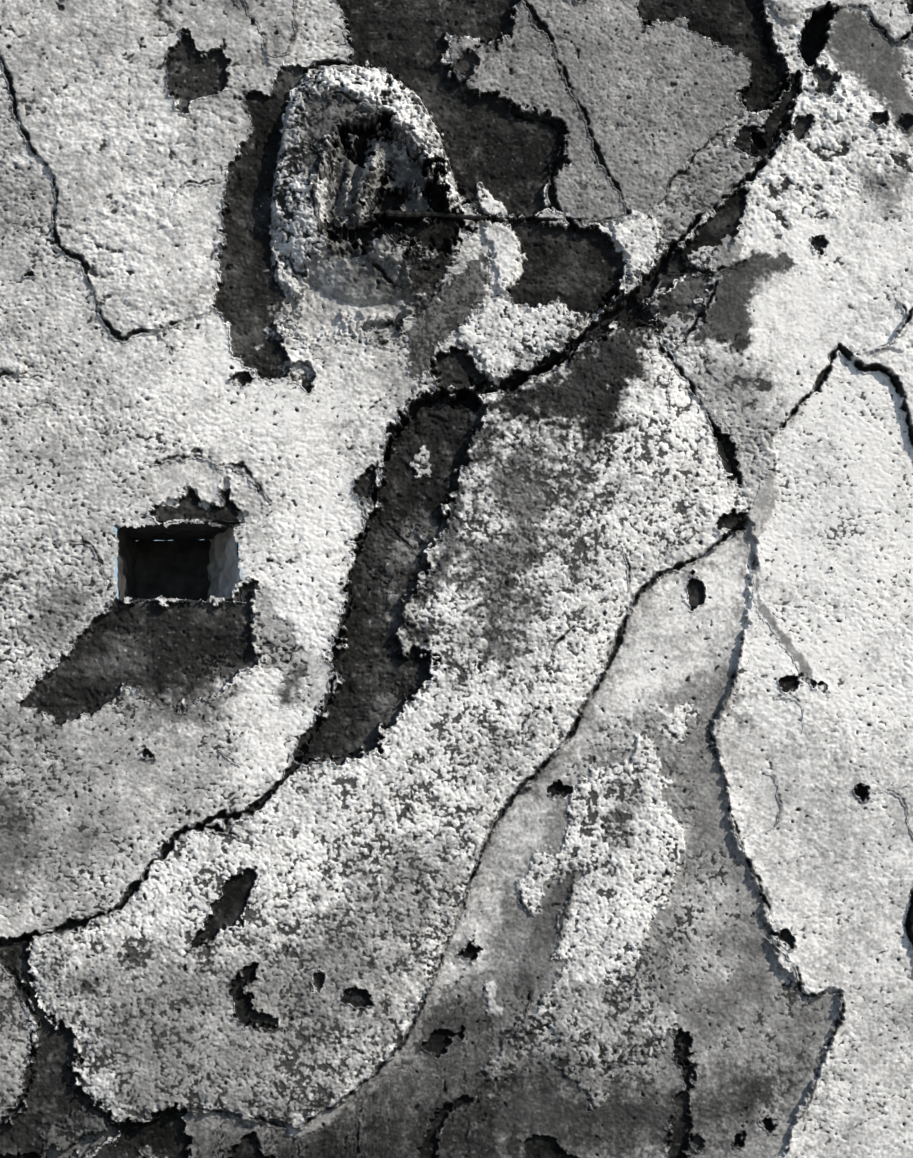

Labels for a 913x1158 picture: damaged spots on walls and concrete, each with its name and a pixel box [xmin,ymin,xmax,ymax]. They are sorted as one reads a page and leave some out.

crack [862,4,913,46]
flaking render [210,61,319,394]
crack [0,0,806,960]
flaking render [306,0,857,769]
crack [781,292,913,446]
flaking render [19,576,267,728]
flaking render [0,932,212,1158]
leakage [308,795,500,977]
crack [116,522,847,1158]
leakage [168,867,844,1158]
flaking render [382,472,846,1158]
crack [905,891,913,951]